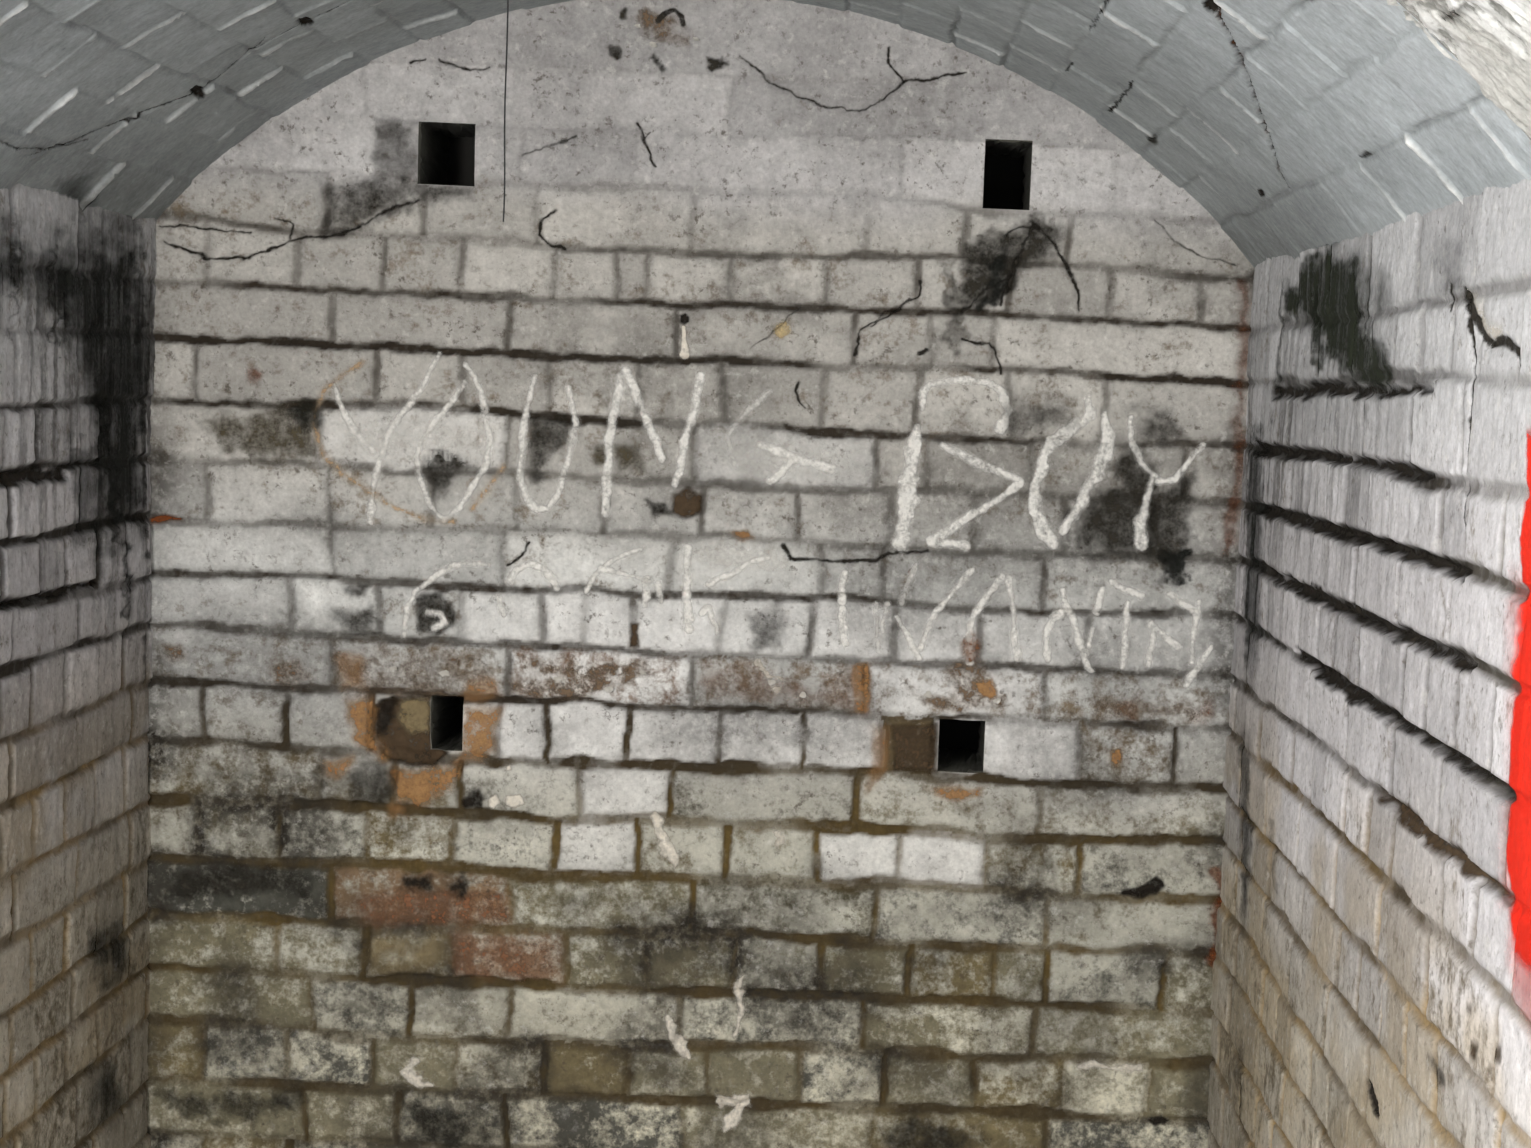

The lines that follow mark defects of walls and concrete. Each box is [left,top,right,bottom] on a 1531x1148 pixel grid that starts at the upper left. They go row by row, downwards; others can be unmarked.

crack [1,40,263,153]
crack [744,47,966,112]
crack [1217,7,1280,169]
crack [159,199,419,261]
damp [943,251,1006,340]
damp [1274,244,1397,393]
damp [0,220,150,619]
crack [1450,283,1521,526]
crack [781,544,929,563]
damp [167,1091,302,1120]
damp [415,1109,491,1145]
damp [887,1119,967,1148]